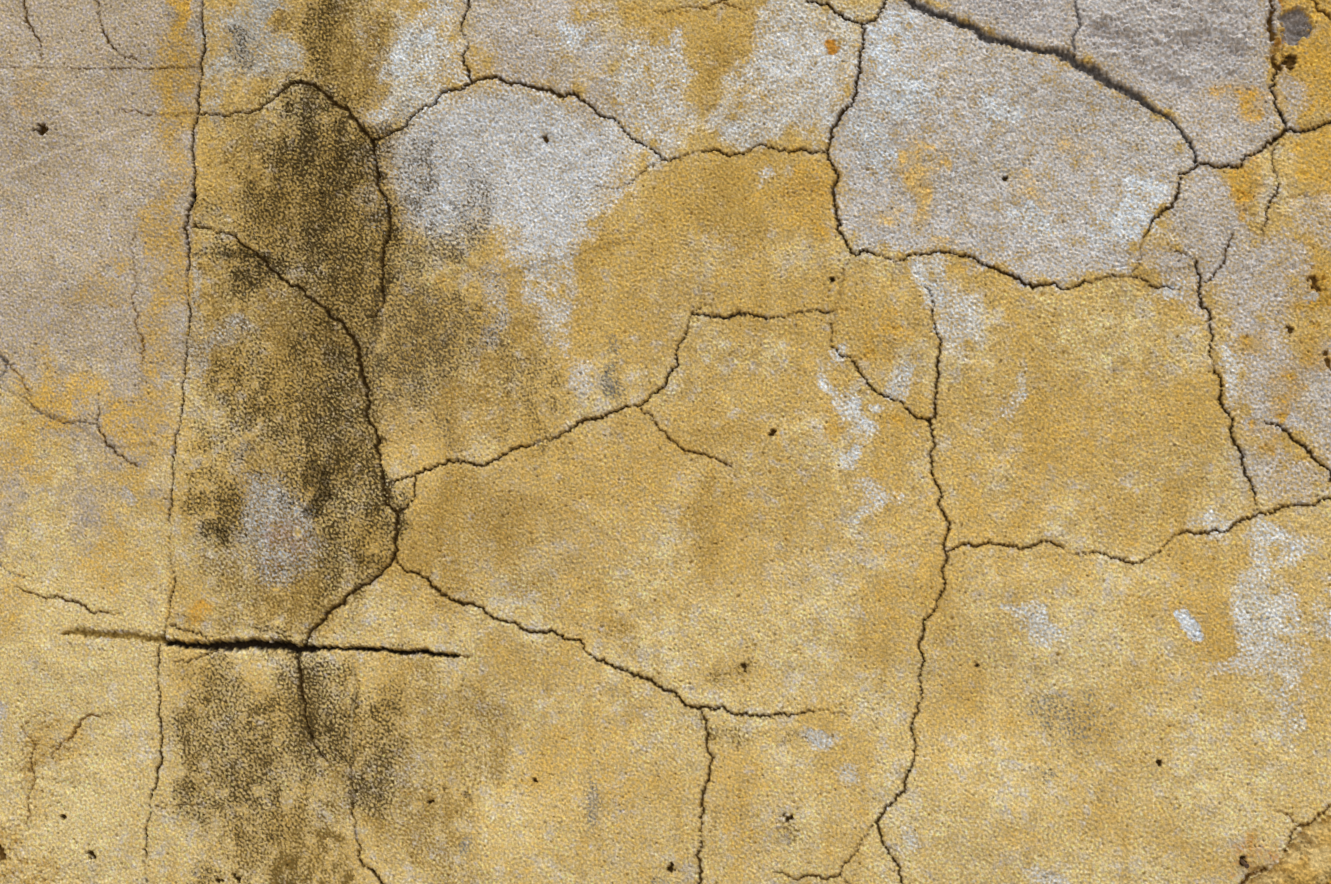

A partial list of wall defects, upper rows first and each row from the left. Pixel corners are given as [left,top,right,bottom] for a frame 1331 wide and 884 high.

crack [0,0,373,194]
water stain [687,21,750,112]
water stain [677,148,771,260]
crack [0,563,123,617]
crack [0,354,139,468]
water stain [143,0,629,884]
crack [60,203,851,884]
water stain [590,608,641,658]
water stain [635,404,761,590]
crack [370,0,1331,884]
crack [20,711,111,826]
spalling [1249,815,1331,884]